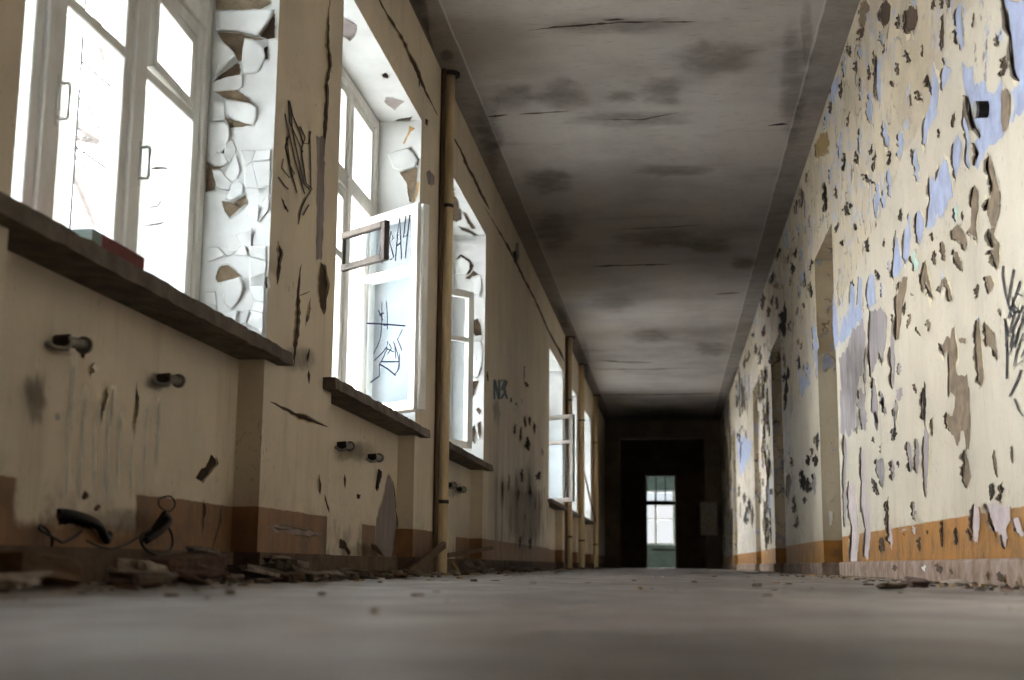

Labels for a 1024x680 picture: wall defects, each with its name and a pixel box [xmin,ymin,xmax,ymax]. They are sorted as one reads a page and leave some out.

crack [323,0,332,171]
crack [379,0,438,115]
crack [536,18,691,30]
peeling [205,0,278,336]
peeling [383,97,435,204]
peeling [721,0,1024,564]
peeling [195,455,219,483]
crack [271,402,328,427]
peeling [371,469,398,557]
peeling [510,397,544,455]